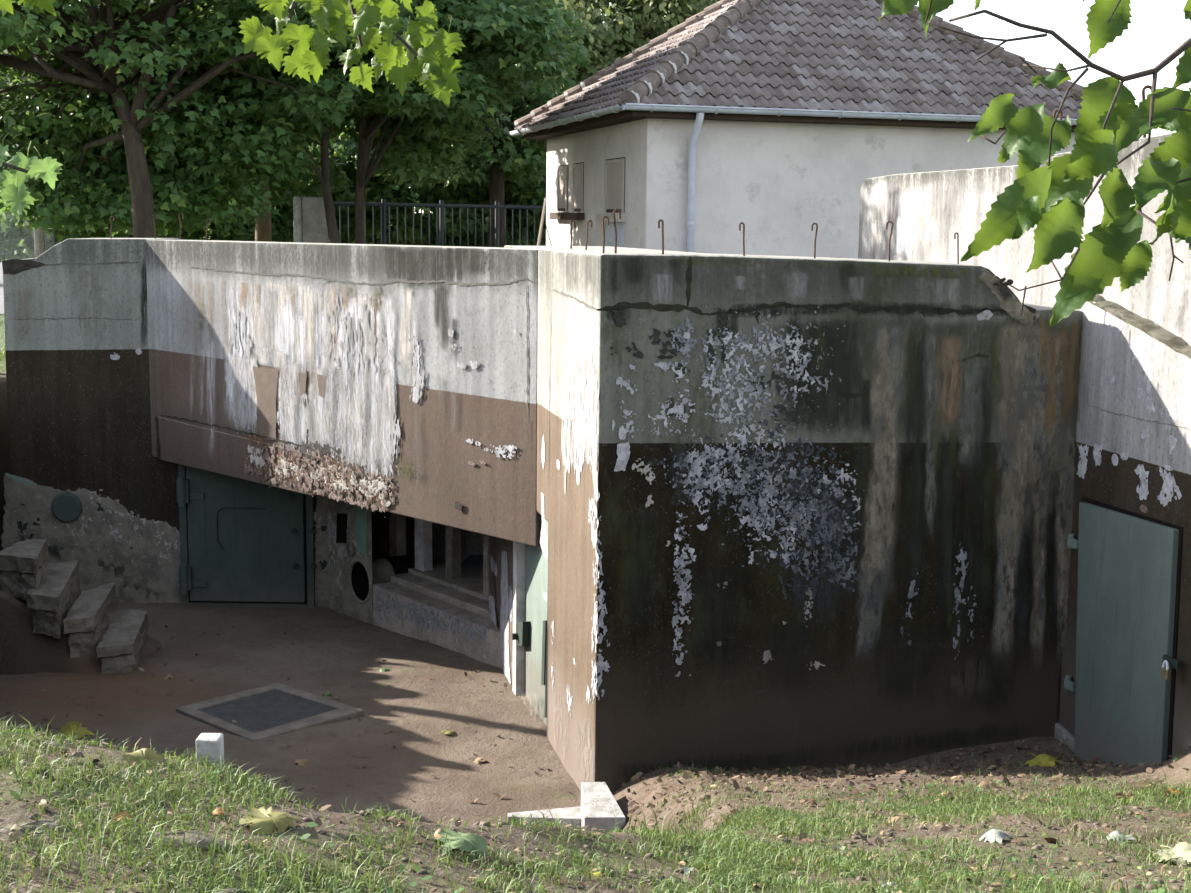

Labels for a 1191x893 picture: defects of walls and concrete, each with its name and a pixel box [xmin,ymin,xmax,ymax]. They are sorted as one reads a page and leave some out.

peeling [229,296,425,608]
leakage [194,247,485,467]
peeling [448,328,480,370]
peeling [466,438,517,466]
peeling [540,362,610,704]
crack [190,256,1015,422]
leakage [612,258,643,289]
peeling [610,305,869,677]
leakage [708,280,1084,656]
peeling [1077,319,1191,513]